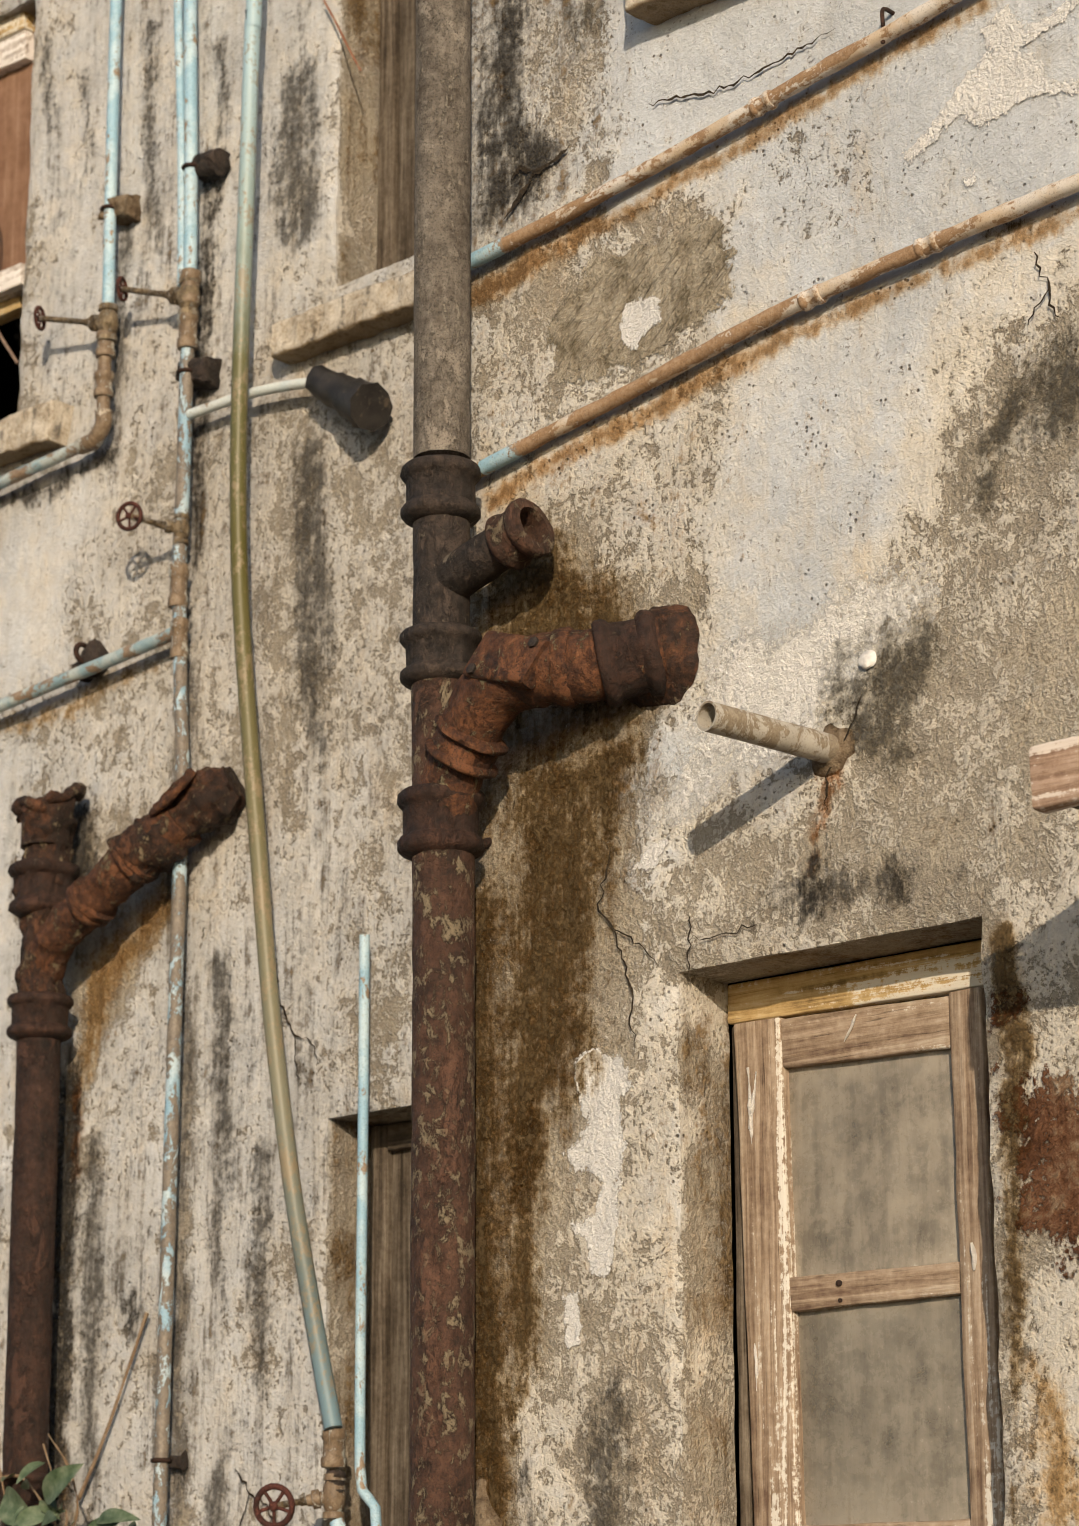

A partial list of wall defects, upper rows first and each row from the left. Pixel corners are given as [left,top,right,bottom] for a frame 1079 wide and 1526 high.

water stain [480,0,557,224]
crack [650,29,834,106]
peeling [902,0,1079,162]
spalling [544,212,737,386]
crack [1028,252,1061,324]
water stain [799,853,845,919]
water stain [474,748,644,1518]
peeling [562,1047,634,1278]
water stain [990,921,1034,1387]
peeling [562,1290,583,1349]